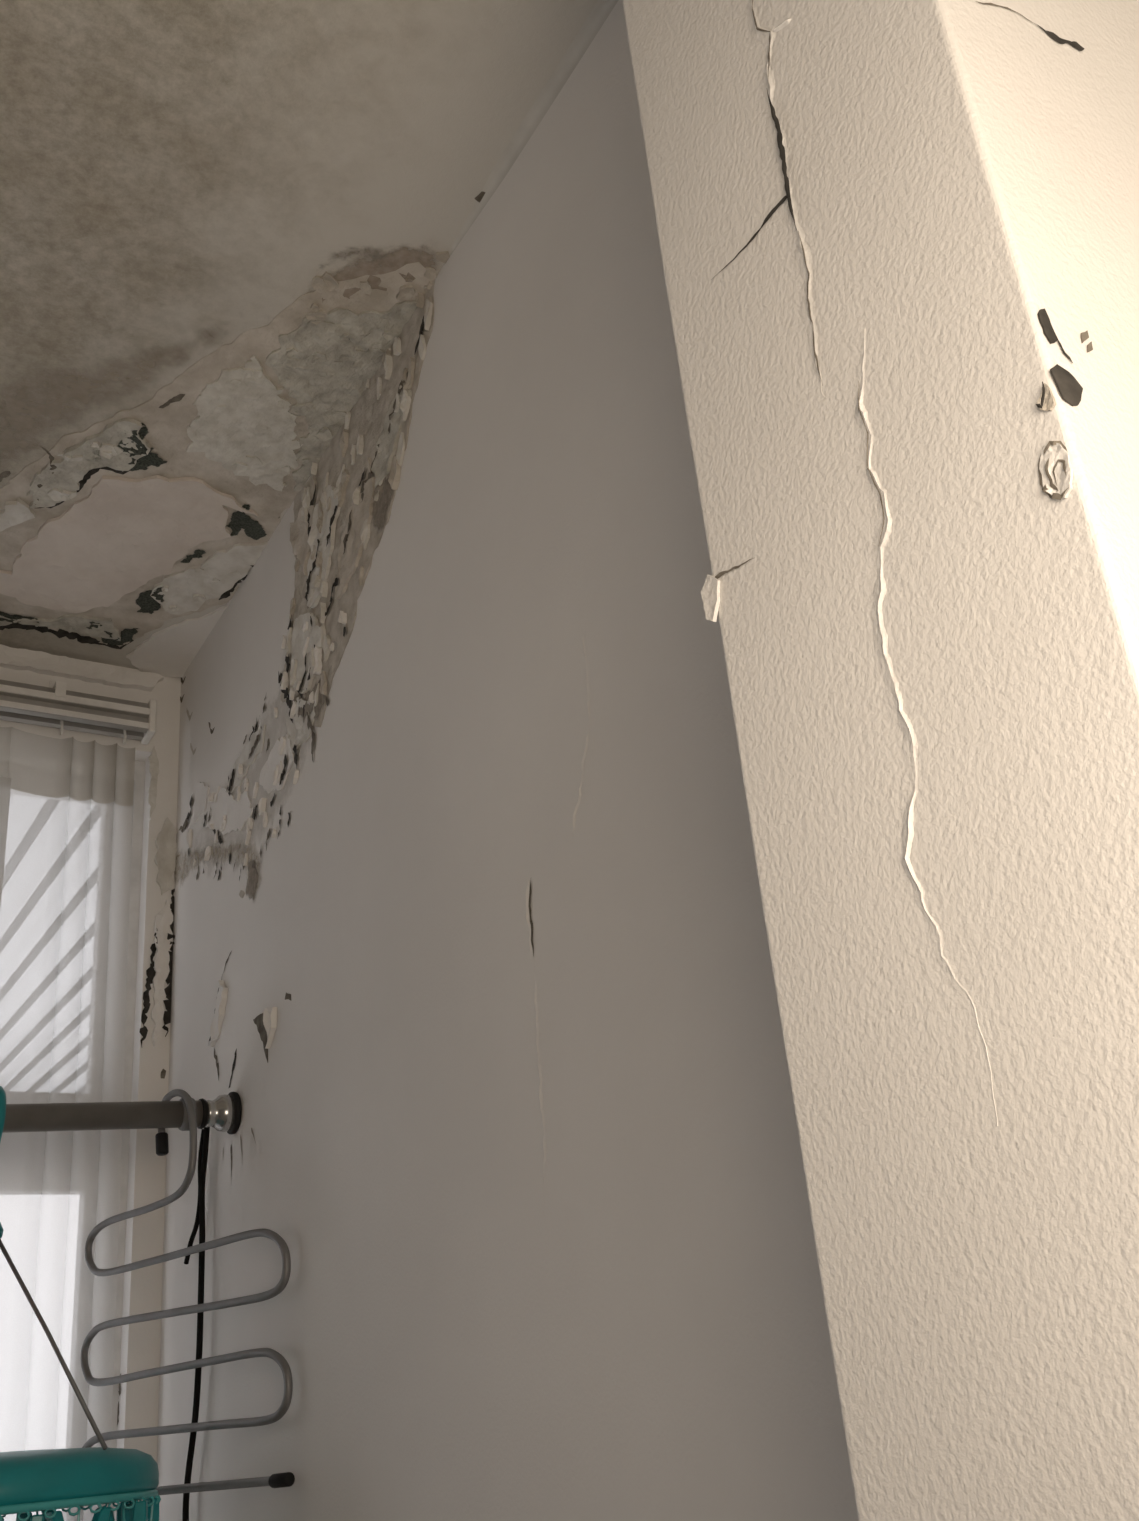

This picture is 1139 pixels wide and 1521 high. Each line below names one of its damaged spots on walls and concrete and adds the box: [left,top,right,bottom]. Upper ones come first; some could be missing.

peeling [0,251,450,1049]
crack [701,559,751,622]
crack [711,0,998,1126]